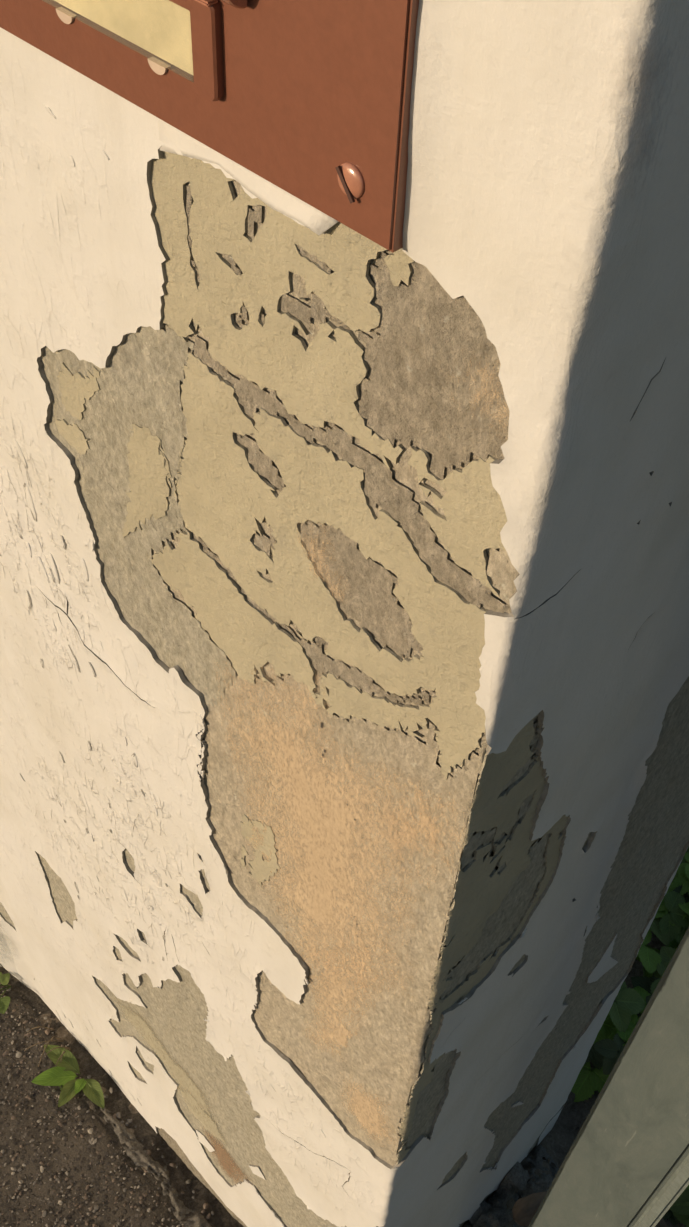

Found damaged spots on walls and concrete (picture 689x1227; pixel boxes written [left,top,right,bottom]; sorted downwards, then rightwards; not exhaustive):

peeling [15,524,66,584]
peeling [38,118,568,1166]
peeling [482,676,689,1169]